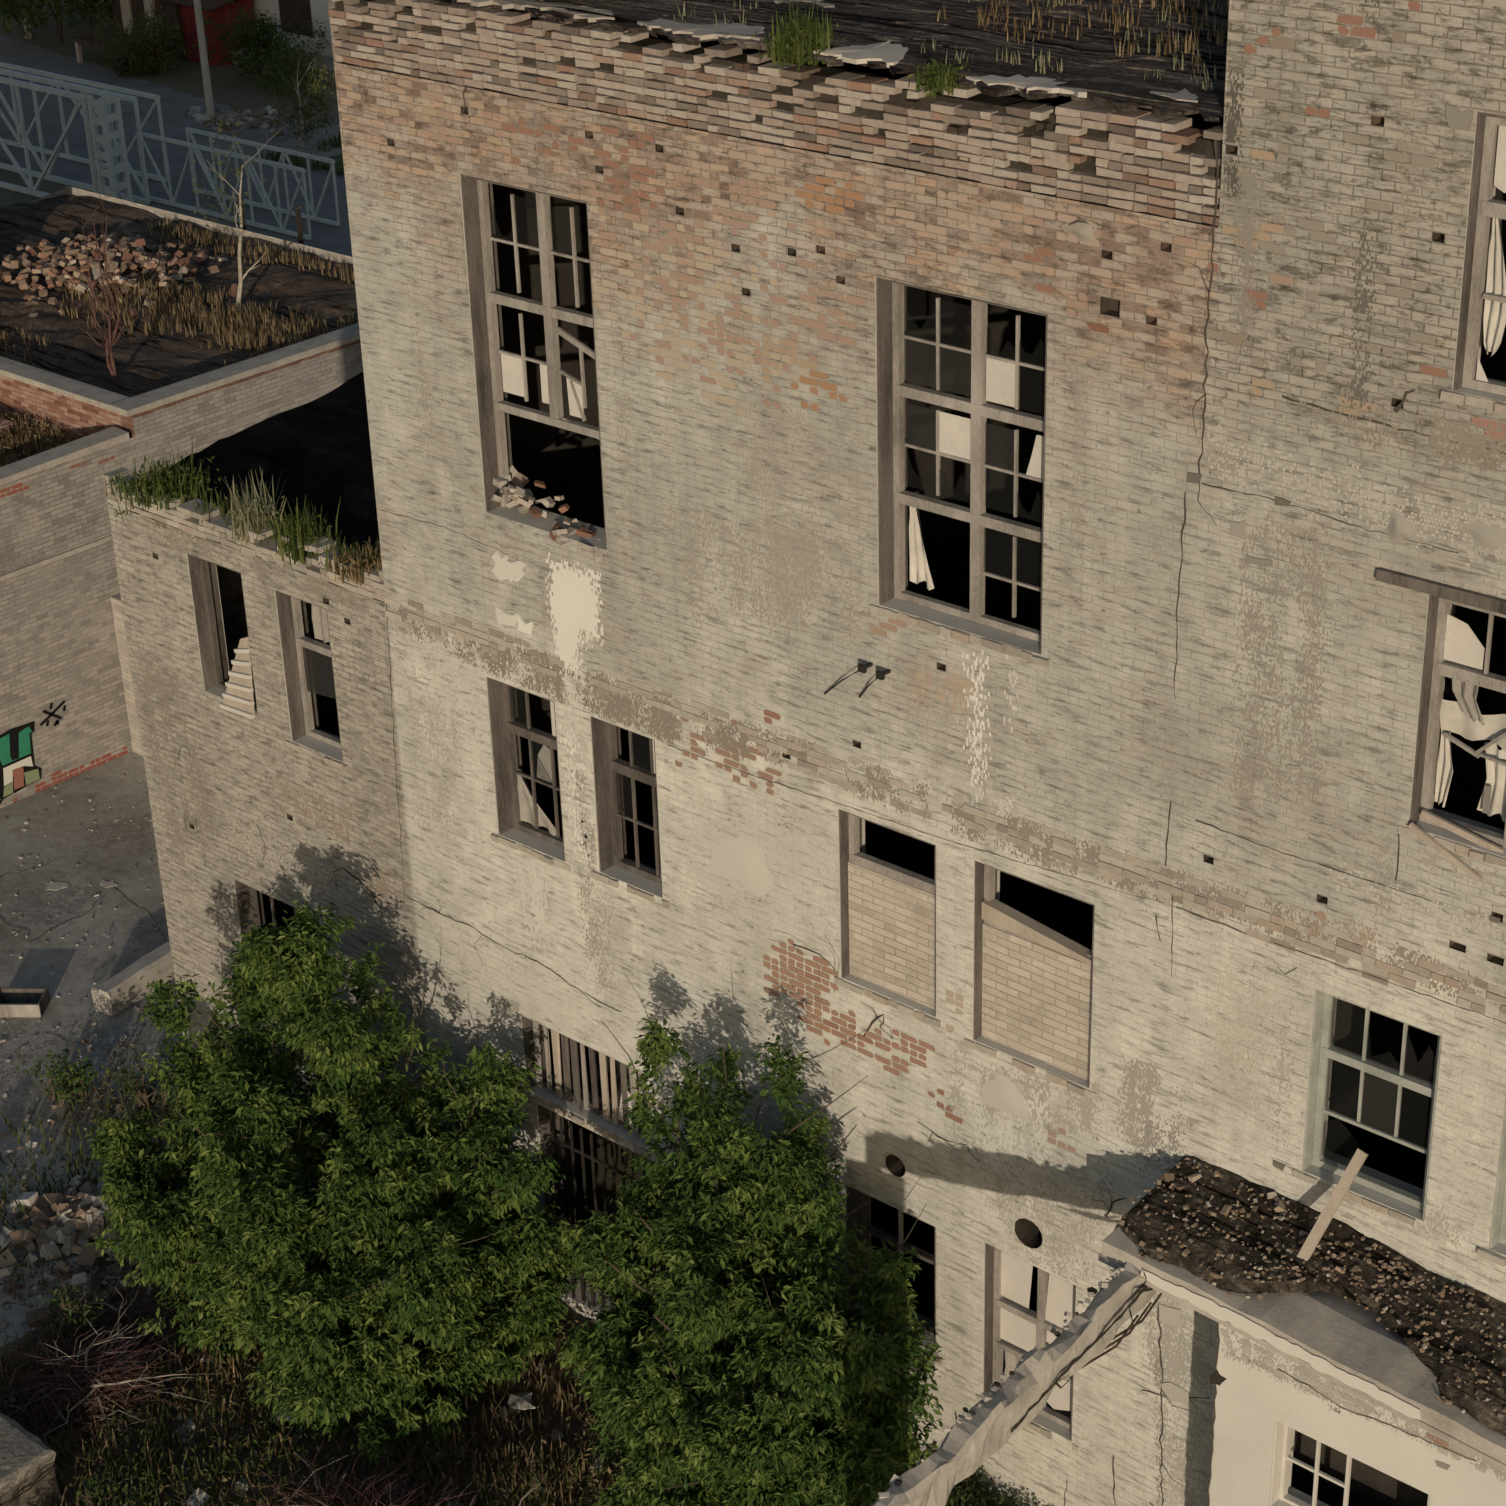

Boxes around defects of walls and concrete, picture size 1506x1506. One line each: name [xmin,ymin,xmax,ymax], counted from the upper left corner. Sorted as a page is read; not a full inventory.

crack [1172,131,1459,699]
spalling [0,483,29,498]
crack [334,604,621,1012]
spalling [671,704,791,795]
spalling [763,939,935,1076]
spalling [946,990,964,1033]
crack [1011,1273,1220,1506]